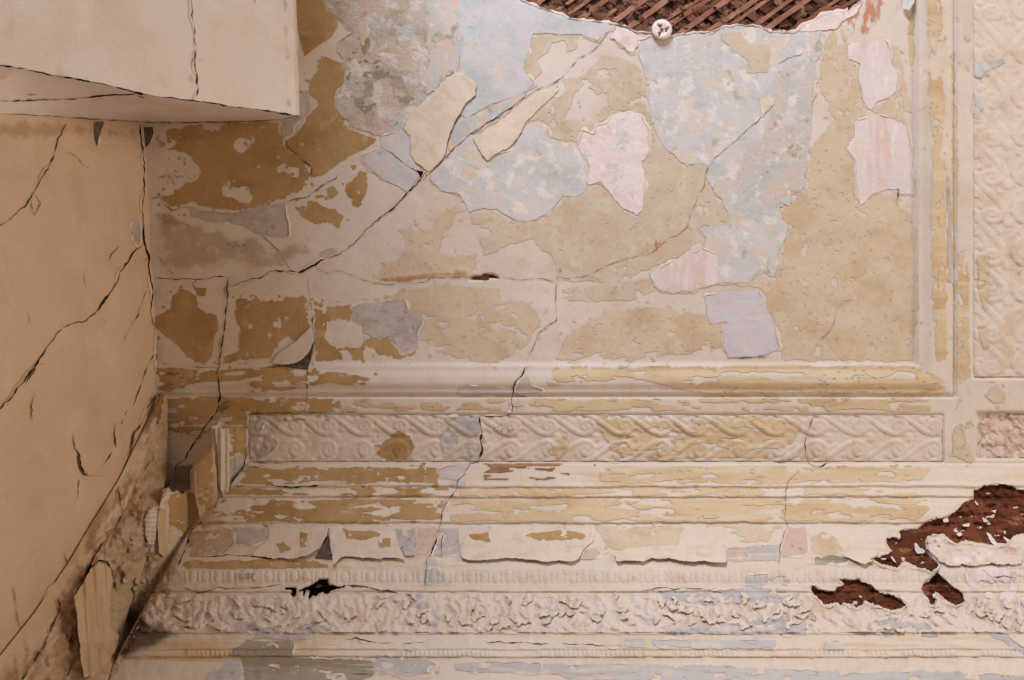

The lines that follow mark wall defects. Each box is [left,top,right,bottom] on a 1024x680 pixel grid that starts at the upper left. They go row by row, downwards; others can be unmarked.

crack [0,0,774,680]
peeling [144,0,947,415]
water stain [121,611,170,654]
flaking render [35,382,1024,680]
crack [776,419,831,564]